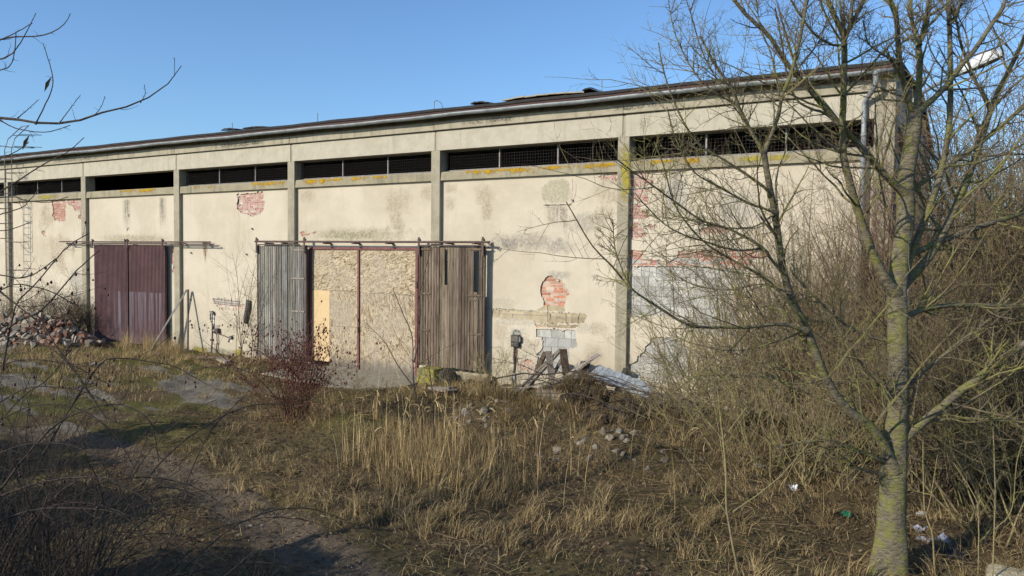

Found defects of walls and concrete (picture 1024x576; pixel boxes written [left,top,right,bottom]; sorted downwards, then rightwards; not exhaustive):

flaking render [51,199,81,222]
flaking render [236,191,265,217]
flaking render [629,170,767,337]
flaking render [490,276,594,386]